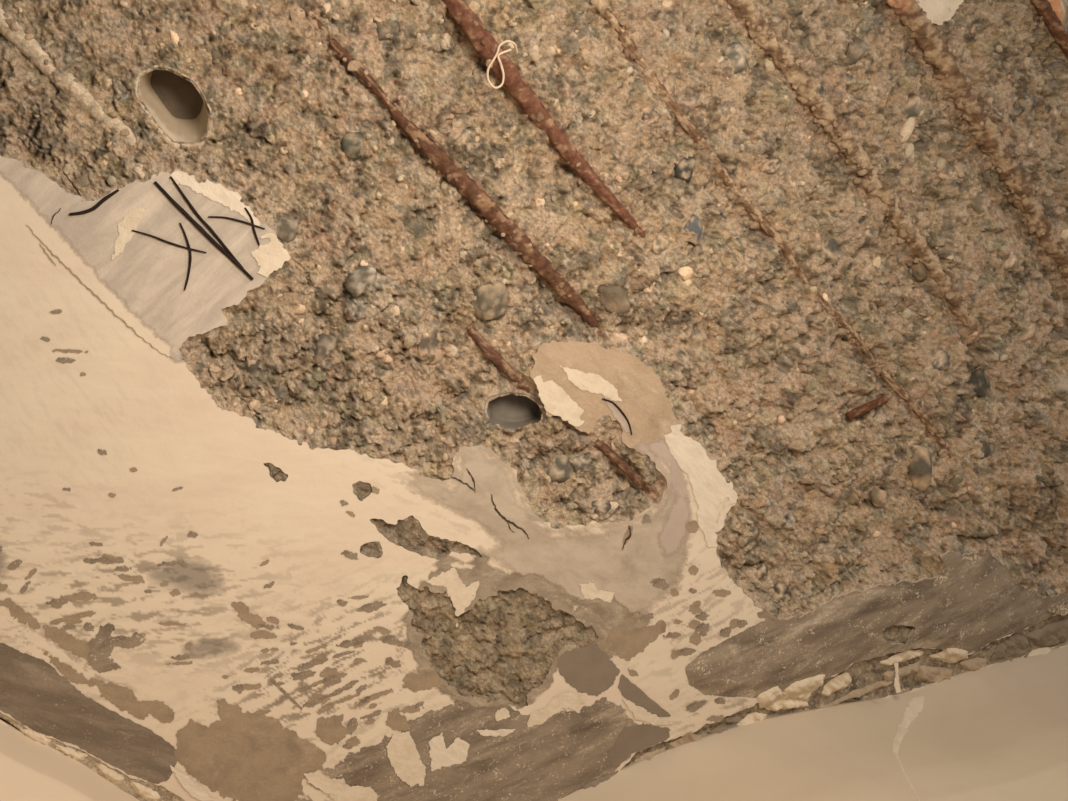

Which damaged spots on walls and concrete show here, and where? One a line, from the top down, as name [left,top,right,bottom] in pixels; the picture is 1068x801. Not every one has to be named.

rust [1048,0,1064,25]
crack [26,175,172,358]
spalling [0,0,1068,619]
peeling [0,549,1068,801]